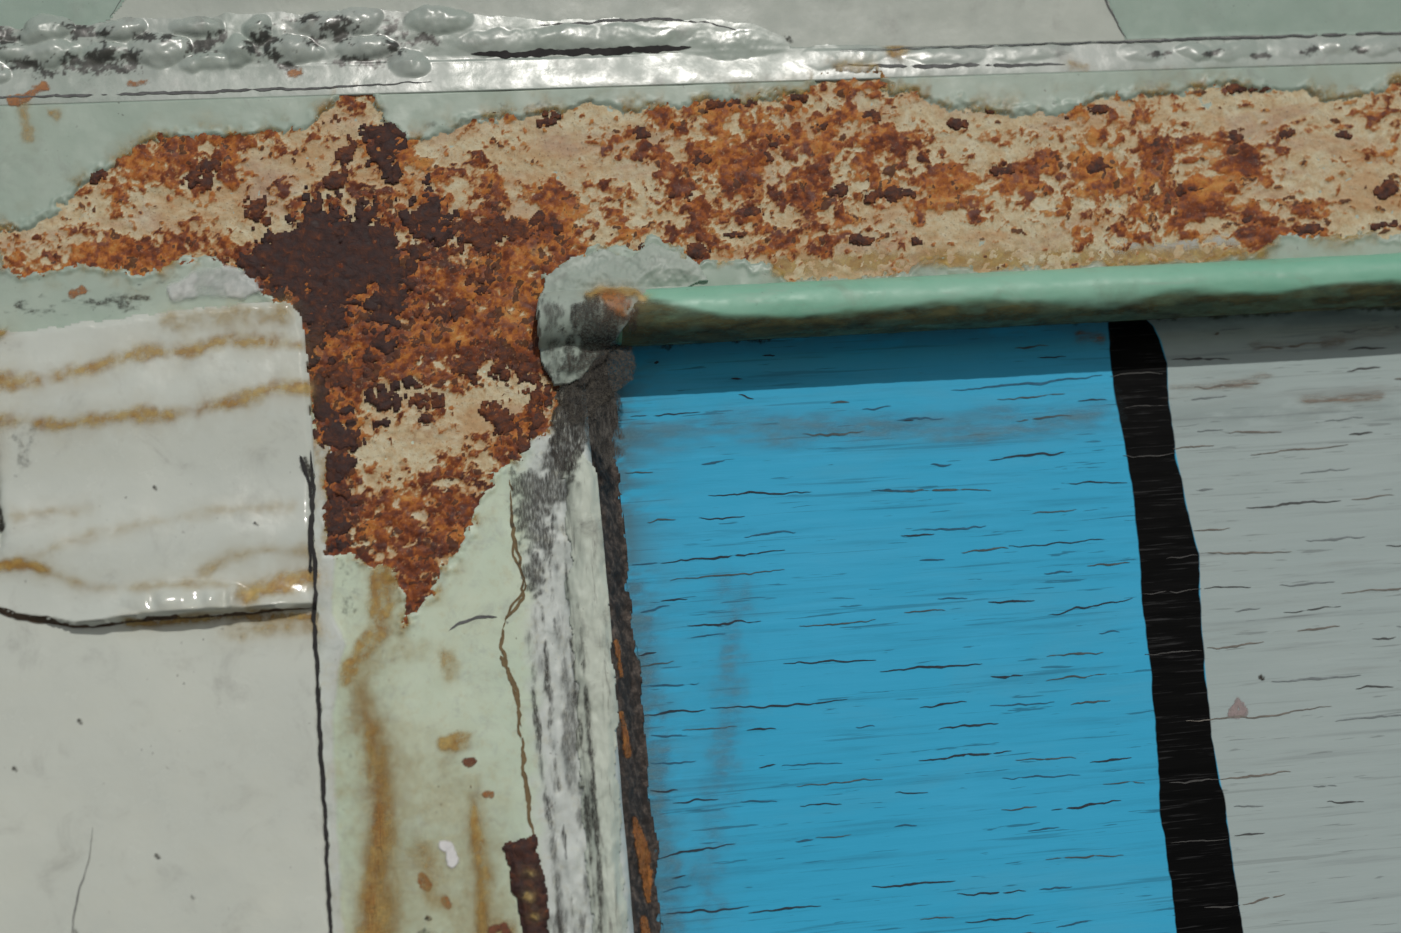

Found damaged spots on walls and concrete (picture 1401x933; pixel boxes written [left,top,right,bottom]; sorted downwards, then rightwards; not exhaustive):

crack [471,17,737,58]
rust [888,47,905,57]
peeling [1107,0,1401,39]
peeling [167,266,261,300]
rust [0,64,1401,685]
crack [0,450,333,933]
rust [358,722,392,933]
crack [450,479,534,834]
rust [470,791,550,933]
water stain [529,618,603,933]
rust [619,711,632,758]
rust [633,817,653,933]